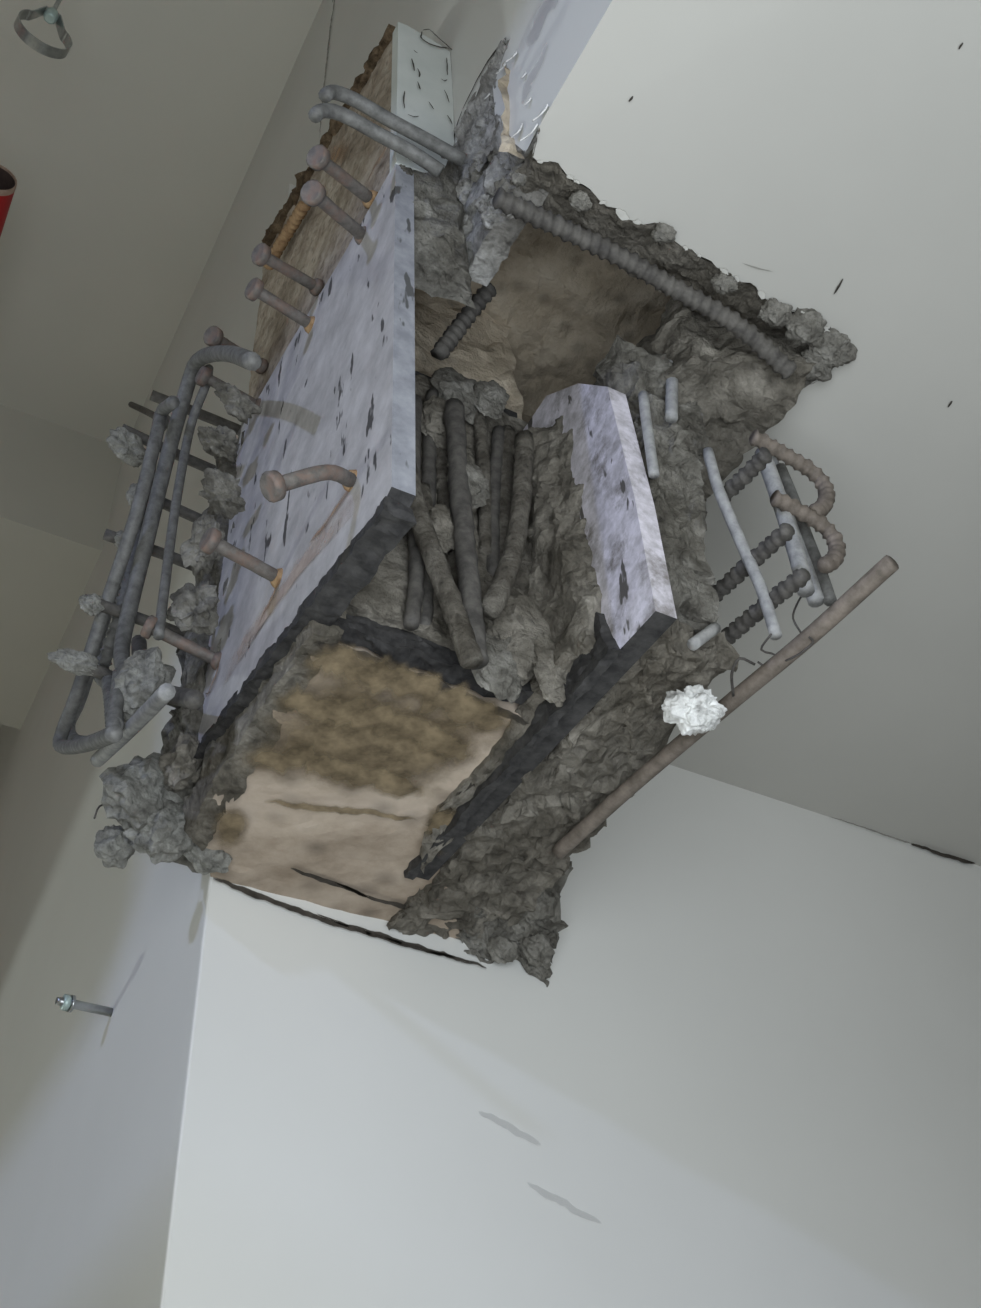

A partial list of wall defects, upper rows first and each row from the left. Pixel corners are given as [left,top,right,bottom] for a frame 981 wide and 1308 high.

spalling [264,200,311,270]
spalling [308,39,858,394]
spalling [53,345,262,767]
spalling [403,388,534,670]
spalling [638,360,678,479]
spalling [456,447,899,987]